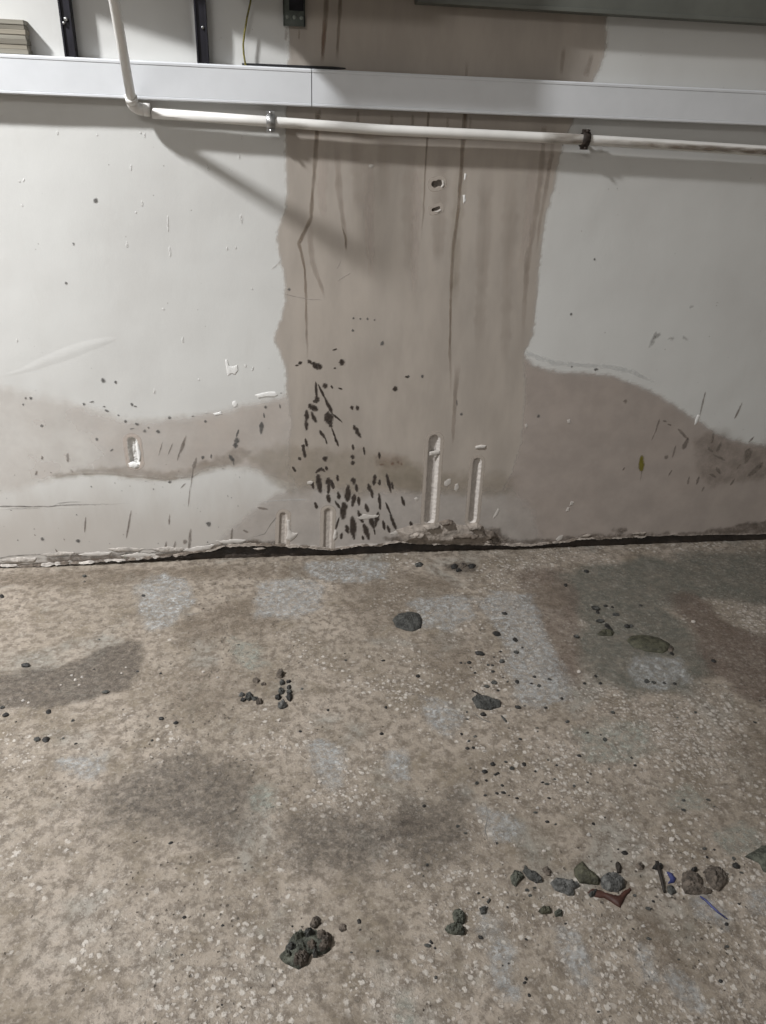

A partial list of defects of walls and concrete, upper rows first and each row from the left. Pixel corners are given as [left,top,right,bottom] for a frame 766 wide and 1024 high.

damp [288,0,607,82]
damp [109,105,766,548]
spalling [0,520,646,568]